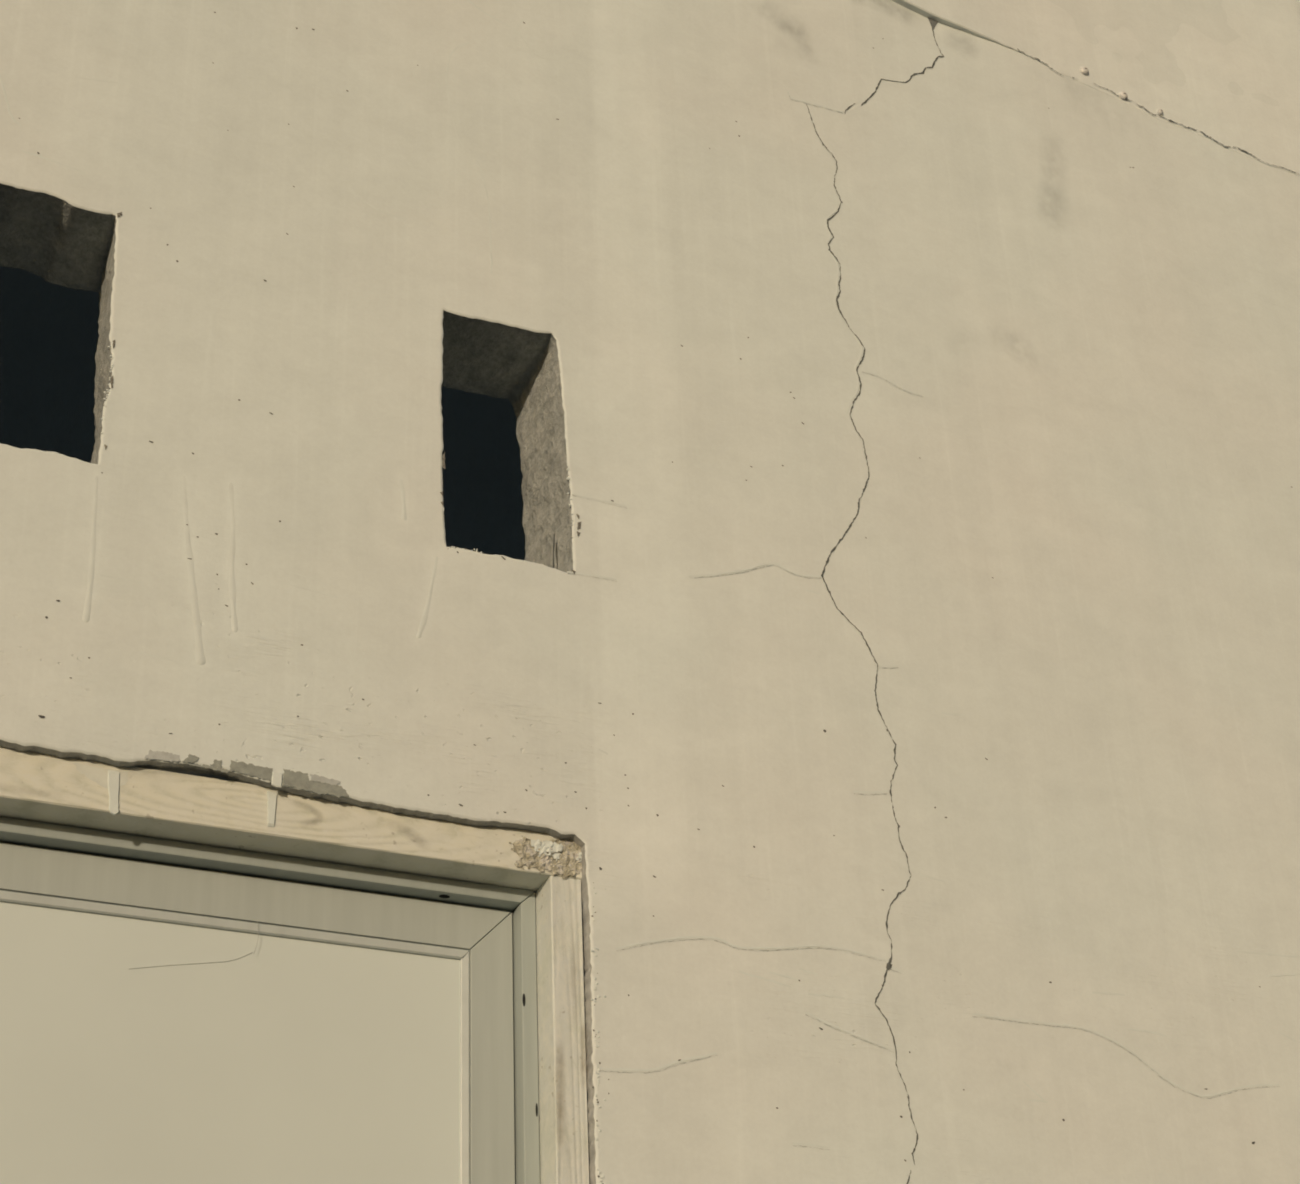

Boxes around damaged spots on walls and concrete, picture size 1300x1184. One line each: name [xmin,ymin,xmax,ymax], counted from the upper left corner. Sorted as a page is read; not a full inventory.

crack [616,18,944,1184]
peeling [144,750,349,797]
spalling [509,837,606,921]
crack [972,1013,1280,1099]